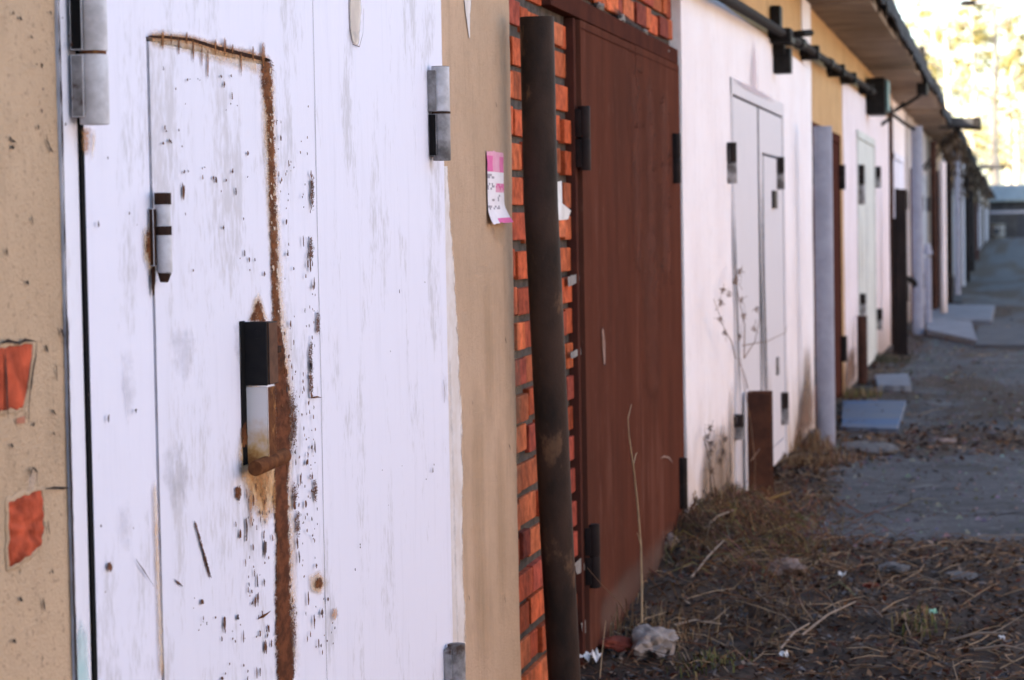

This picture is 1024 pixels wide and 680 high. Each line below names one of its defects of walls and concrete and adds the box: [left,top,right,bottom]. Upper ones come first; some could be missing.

corrosion [145,229,156,296]
flaking render [0,338,48,427]
corrosion [149,31,322,680]
flaking render [5,467,68,571]
corrosion [311,557,337,619]